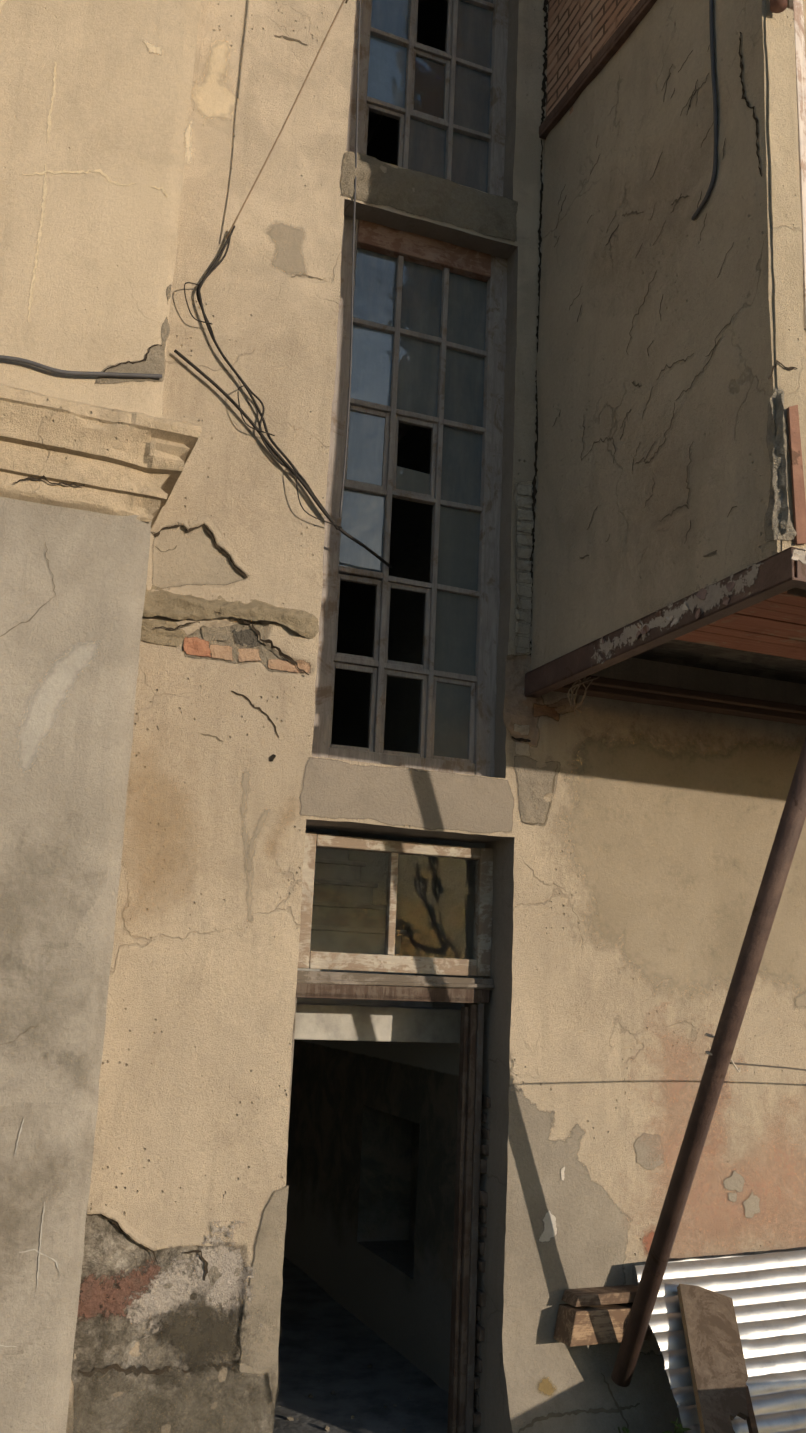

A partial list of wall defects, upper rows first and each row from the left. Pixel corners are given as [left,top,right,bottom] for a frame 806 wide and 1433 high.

crack [662,32,762,177]
crack [552,137,734,544]
crack [14,475,85,486]
spalling [764,360,806,564]
crack [0,542,56,637]
peeling [151,516,253,589]
flaking render [155,612,311,675]
peeling [591,562,763,667]
crack [231,690,279,737]
spalling [503,655,577,826]
spalling [71,1205,278,1433]
crack [518,1373,640,1433]